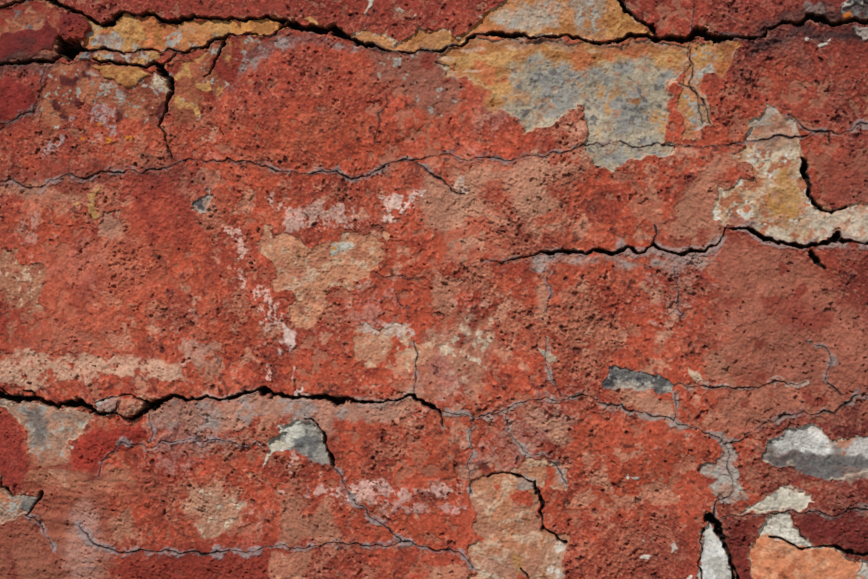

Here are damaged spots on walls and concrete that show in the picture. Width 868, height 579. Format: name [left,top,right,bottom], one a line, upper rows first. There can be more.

spalling [0,0,282,137]
peeling [351,0,741,173]
crack [0,0,868,319]
peeling [712,103,868,243]
spalling [263,419,330,466]
crack [0,271,868,579]
spalling [602,364,673,396]
peeling [697,450,868,579]
spalling [762,423,868,480]